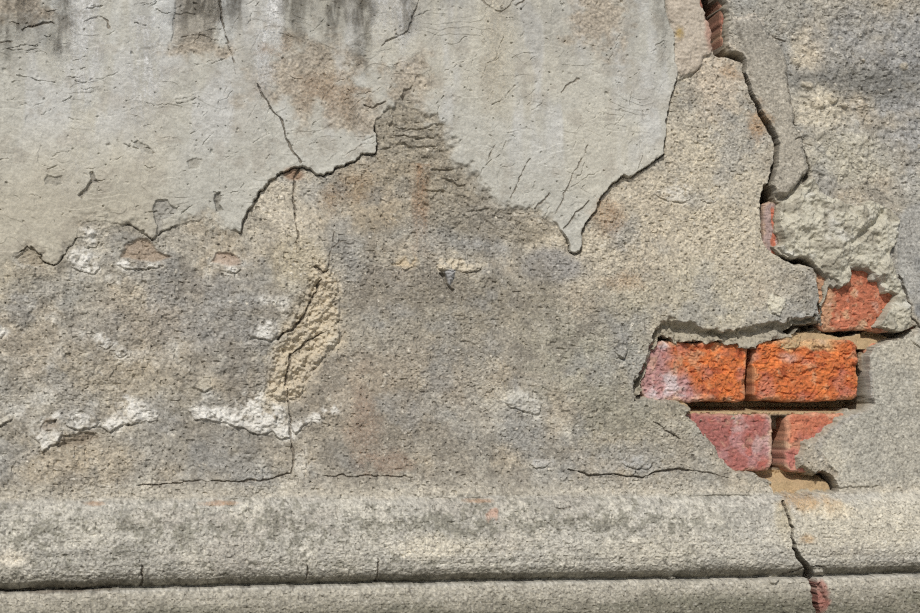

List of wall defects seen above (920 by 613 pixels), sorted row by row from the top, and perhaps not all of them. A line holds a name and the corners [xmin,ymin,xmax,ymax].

crack [217,0,237,75]
leakage [261,0,301,72]
crack [257,83,303,251]
crack [699,0,920,338]
peeling [562,60,920,498]
crack [137,225,354,487]
crack [567,468,730,480]
crack [815,470,839,492]
crack [780,500,828,583]